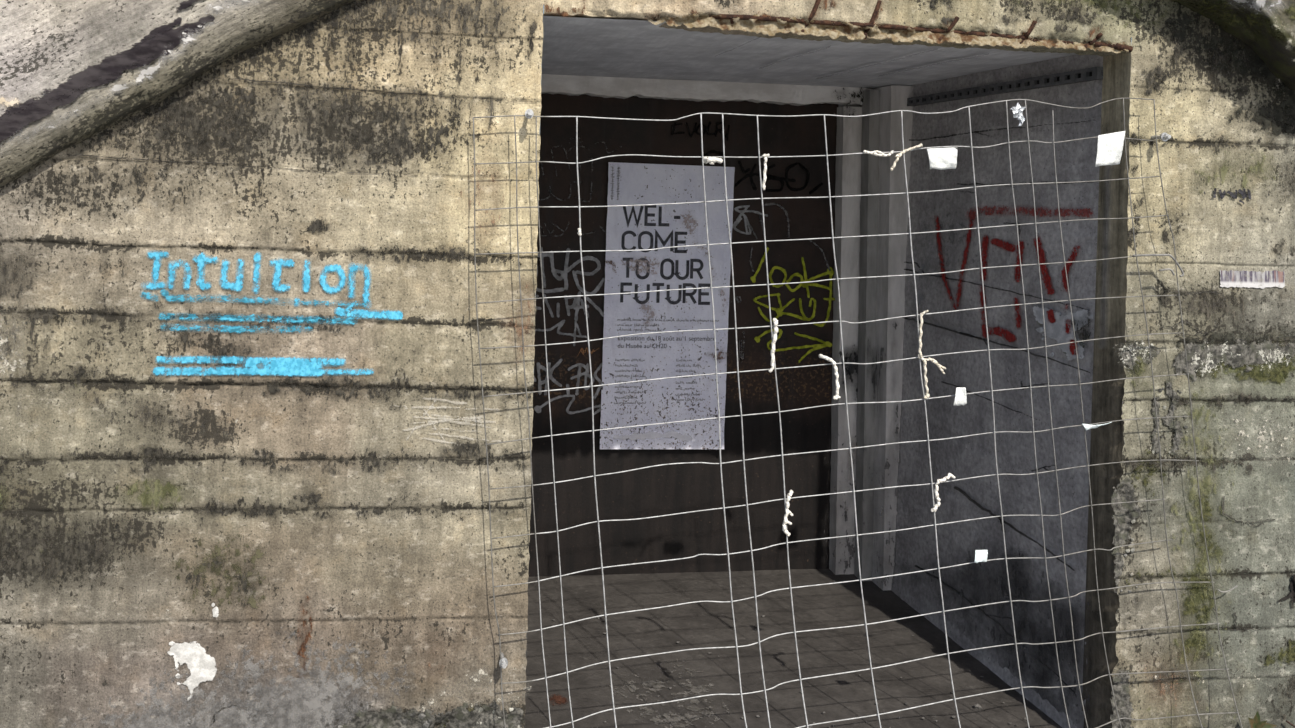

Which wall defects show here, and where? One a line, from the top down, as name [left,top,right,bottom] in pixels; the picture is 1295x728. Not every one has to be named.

rust [544,1,585,16]
damp [0,0,538,229]
damp [0,237,537,478]
damp [0,505,135,597]
damp [197,492,334,526]
damp [351,492,524,521]